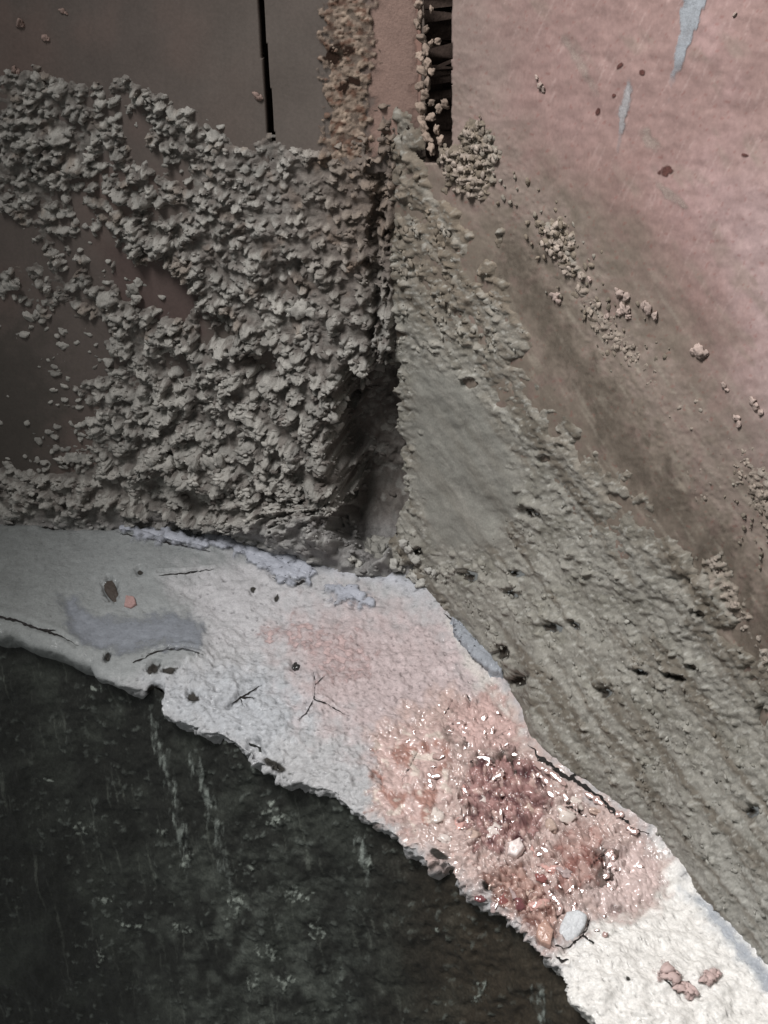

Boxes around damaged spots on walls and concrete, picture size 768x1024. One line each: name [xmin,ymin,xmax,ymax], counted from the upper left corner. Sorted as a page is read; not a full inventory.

peeling [119,525,317,586]
crack [0,616,79,646]
crack [232,685,262,705]
crack [299,670,346,719]
water stain [151,718,187,861]
water stain [188,759,219,842]
corrosion [367,685,661,938]
crack [528,745,649,834]